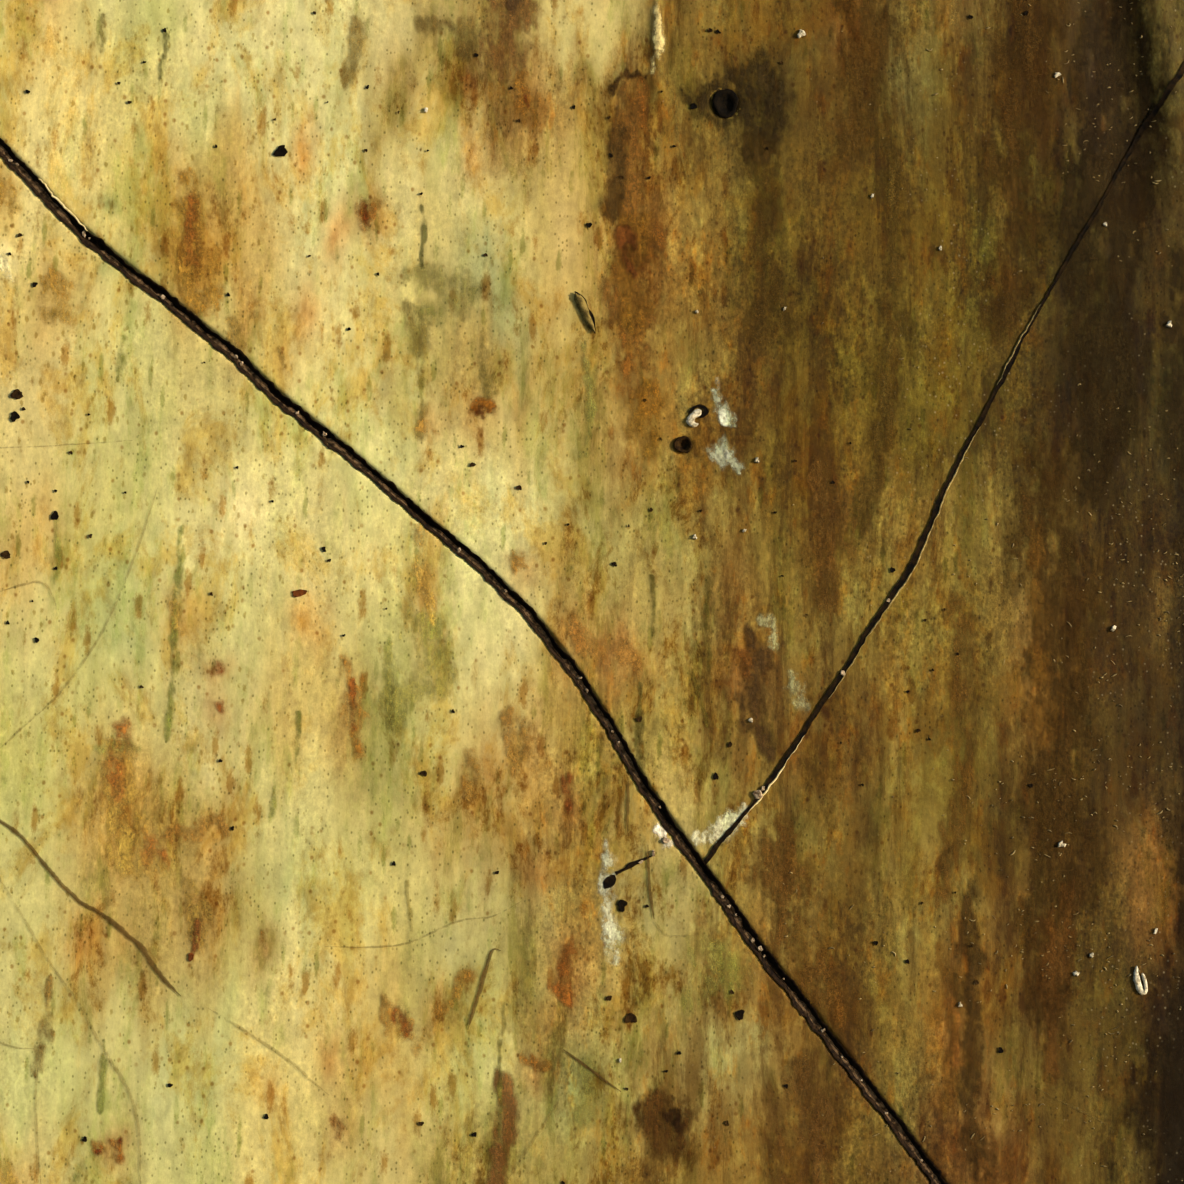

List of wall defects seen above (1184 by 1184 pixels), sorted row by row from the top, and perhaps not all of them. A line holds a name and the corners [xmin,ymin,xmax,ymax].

damp [681,47,795,345]
crack [0,138,948,1184]
crack [703,62,1184,864]
damp [937,599,977,903]
damp [956,879,990,1180]
damp [982,0,1170,1081]
damp [1159,244,1184,476]
damp [1162,803,1184,953]